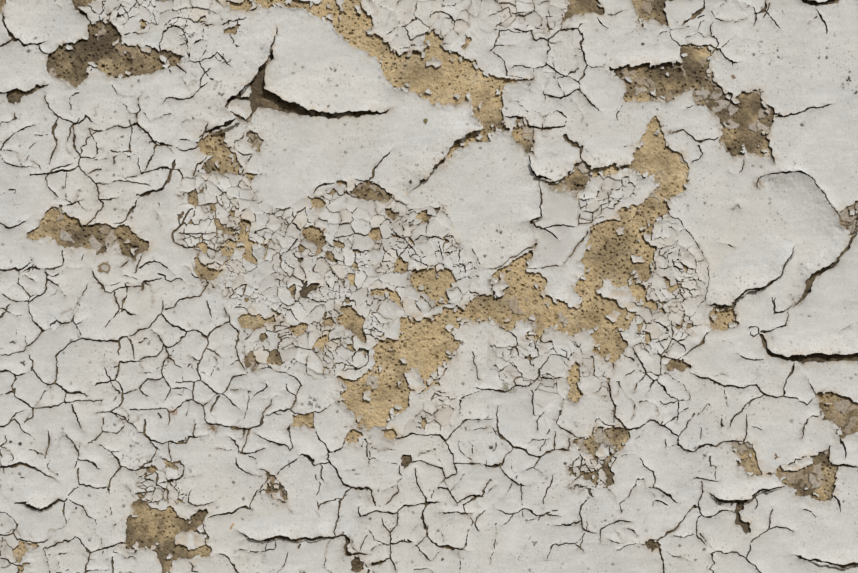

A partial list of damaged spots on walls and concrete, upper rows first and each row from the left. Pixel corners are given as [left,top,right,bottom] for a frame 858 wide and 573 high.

peeling [46,20,184,88]
crack [72,0,254,117]
crack [660,0,839,65]
peeling [27,204,149,261]
crack [0,84,481,529]
peeling [183,0,691,447]
crack [365,0,644,269]
peeling [608,0,858,357]
crack [749,235,856,337]
crack [238,216,816,573]
peeling [125,499,212,573]
peeling [701,441,838,534]